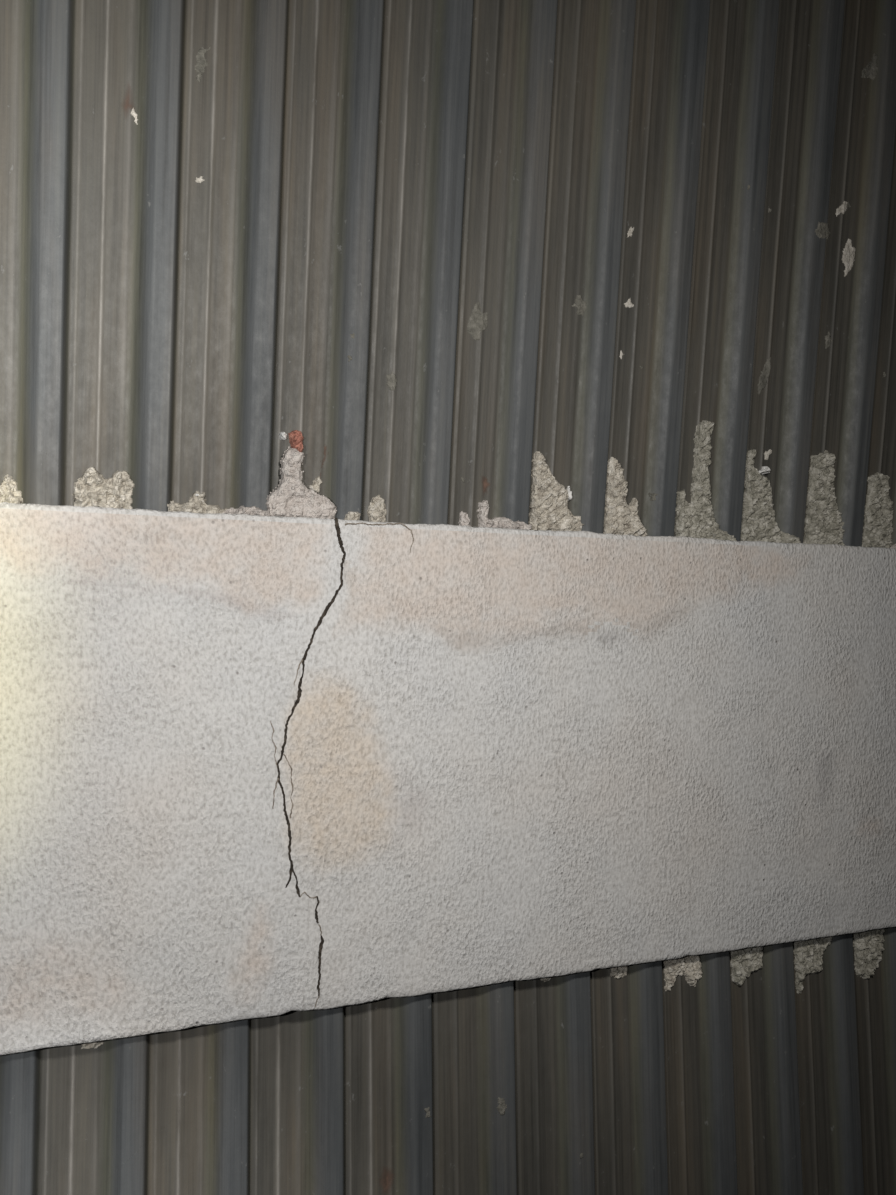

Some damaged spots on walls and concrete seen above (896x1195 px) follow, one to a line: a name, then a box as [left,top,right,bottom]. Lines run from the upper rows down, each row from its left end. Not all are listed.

crack [270,518,414,1007]